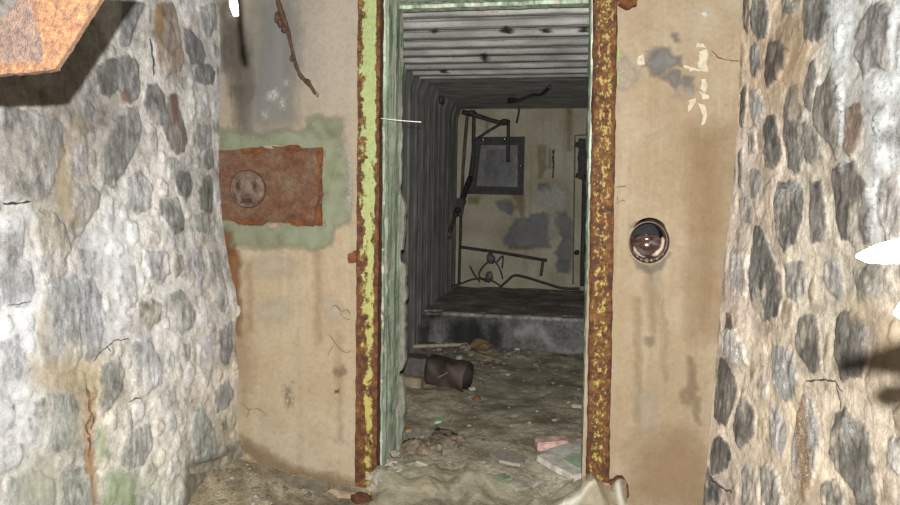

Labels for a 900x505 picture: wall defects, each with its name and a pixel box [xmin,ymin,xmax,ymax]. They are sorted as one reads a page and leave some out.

spalling [617,43,709,125]
corrosion [239,145,304,154]
peeling [220,116,351,250]
corrosion [284,147,324,227]
corrosion [232,218,267,226]
crack [93,338,130,362]
crack [806,379,867,444]